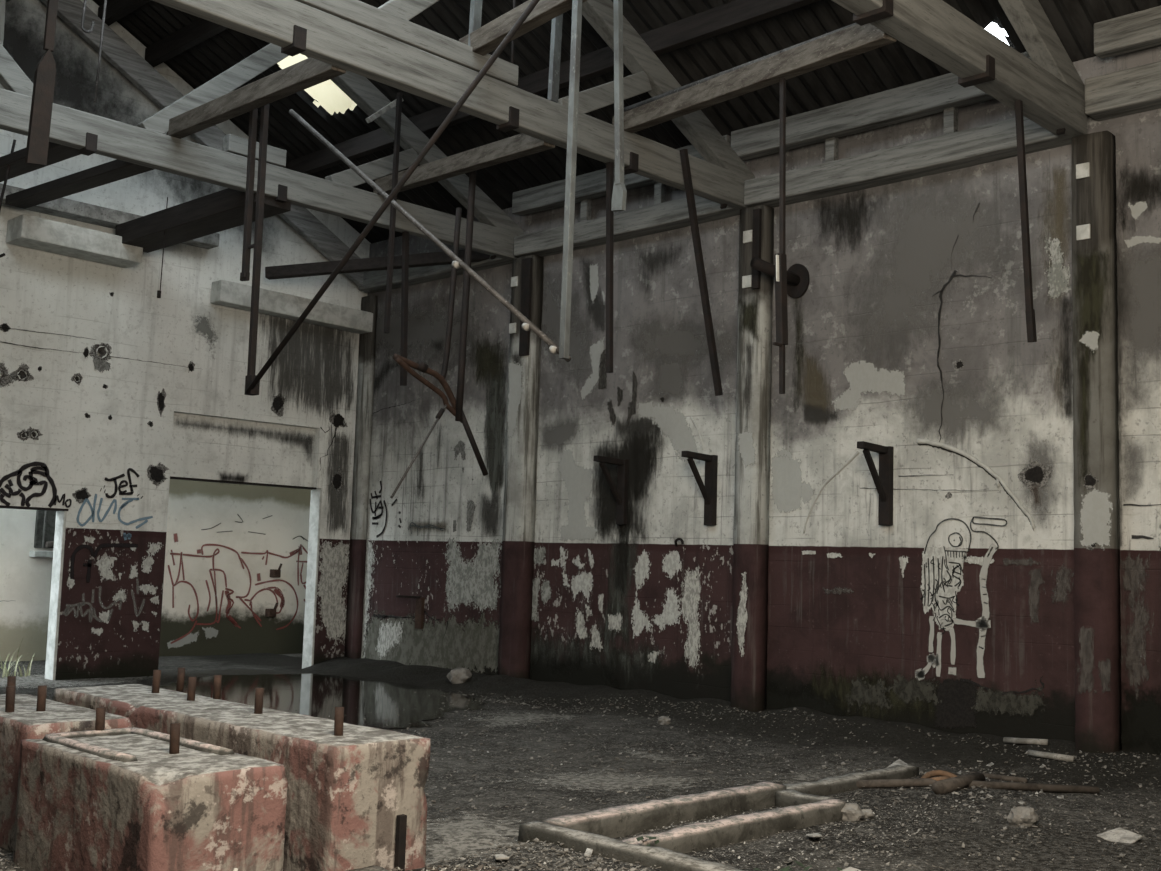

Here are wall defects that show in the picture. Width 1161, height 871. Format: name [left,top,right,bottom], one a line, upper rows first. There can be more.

crack [932,203,991,442]
peeling [832,359,906,412]
crack [862,474,977,491]
peeling [91,542,164,636]
peeling [167,627,218,649]
peeling [316,541,350,645]
spalling [361,500,502,674]
water stain [530,419,662,690]
peeling [532,546,702,667]
peeling [736,572,748,657]